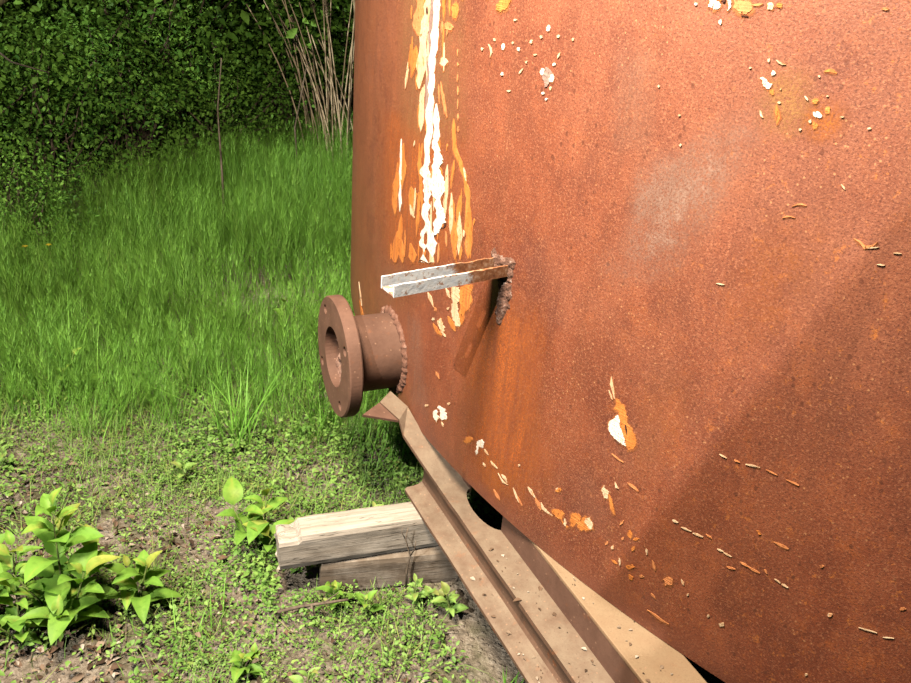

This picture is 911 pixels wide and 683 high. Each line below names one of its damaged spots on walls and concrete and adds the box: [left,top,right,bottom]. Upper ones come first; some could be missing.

peeling [694,0,783,25]
peeling [398,0,463,265]
corrosion [387,0,475,266]
peeling [540,52,561,101]
peeling [760,58,786,125]
peeling [799,95,830,131]
peeling [427,284,473,337]
corrosion [464,306,536,505]
peeling [607,376,638,463]
peeling [475,439,519,502]
corrosion [552,509,593,531]